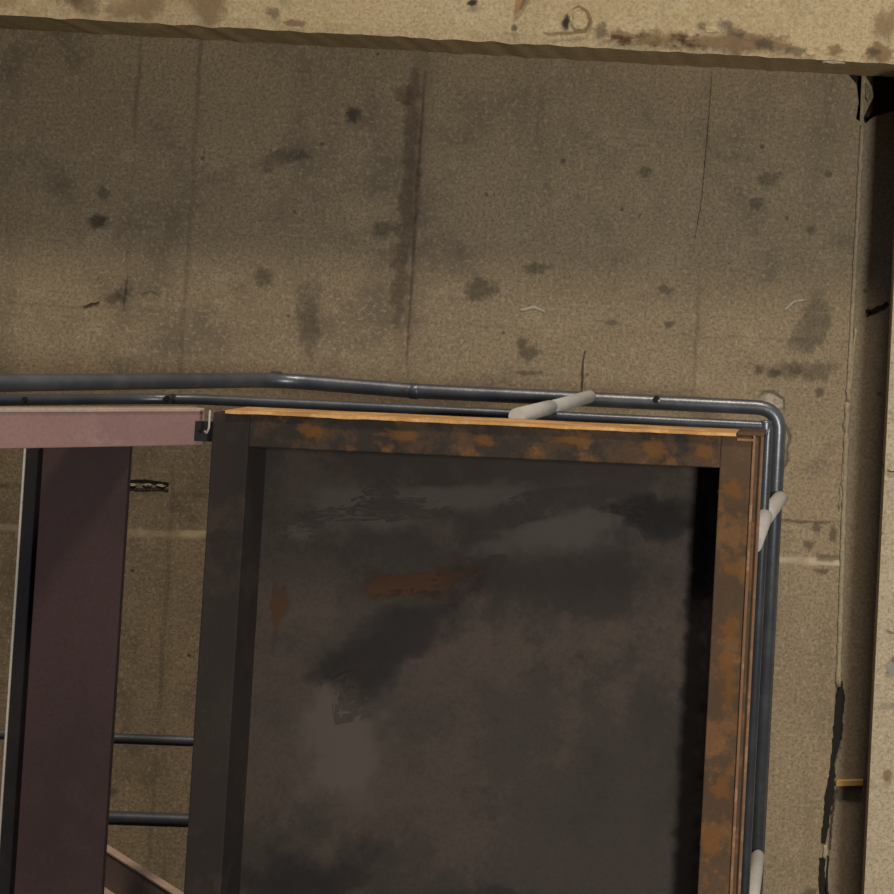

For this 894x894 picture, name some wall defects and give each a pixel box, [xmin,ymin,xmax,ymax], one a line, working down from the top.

crack [818,681,845,894]